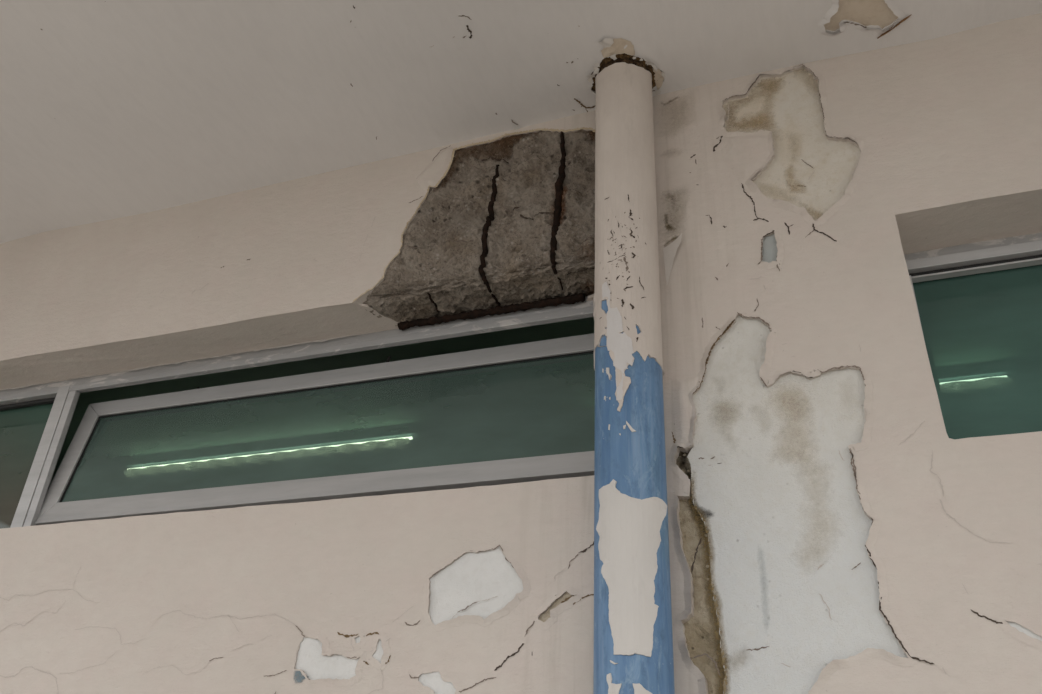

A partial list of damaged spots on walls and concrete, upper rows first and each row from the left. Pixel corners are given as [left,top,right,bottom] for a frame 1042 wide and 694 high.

peeling [817,0,912,39]
corrosion [436,132,532,188]
peeling [716,63,867,226]
spalling [352,120,646,342]
peeling [755,228,785,271]
peeling [668,308,946,694]
peeling [289,625,390,688]
crack [337,606,420,694]
peeling [409,664,463,694]
peeling [422,539,531,633]
crack [459,542,594,693]
leakage [688,488,728,694]